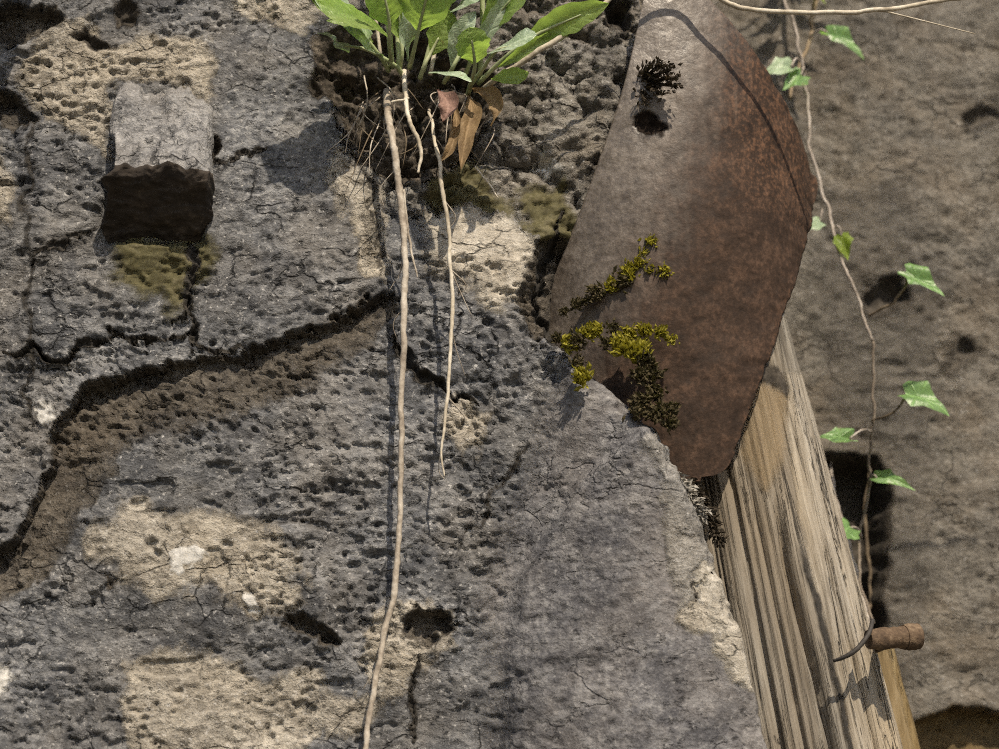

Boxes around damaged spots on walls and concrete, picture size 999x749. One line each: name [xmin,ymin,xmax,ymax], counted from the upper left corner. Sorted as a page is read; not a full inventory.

water stain [114,236,217,310]
spalling [0,147,400,601]
spalling [83,495,342,647]
spalling [825,452,893,629]